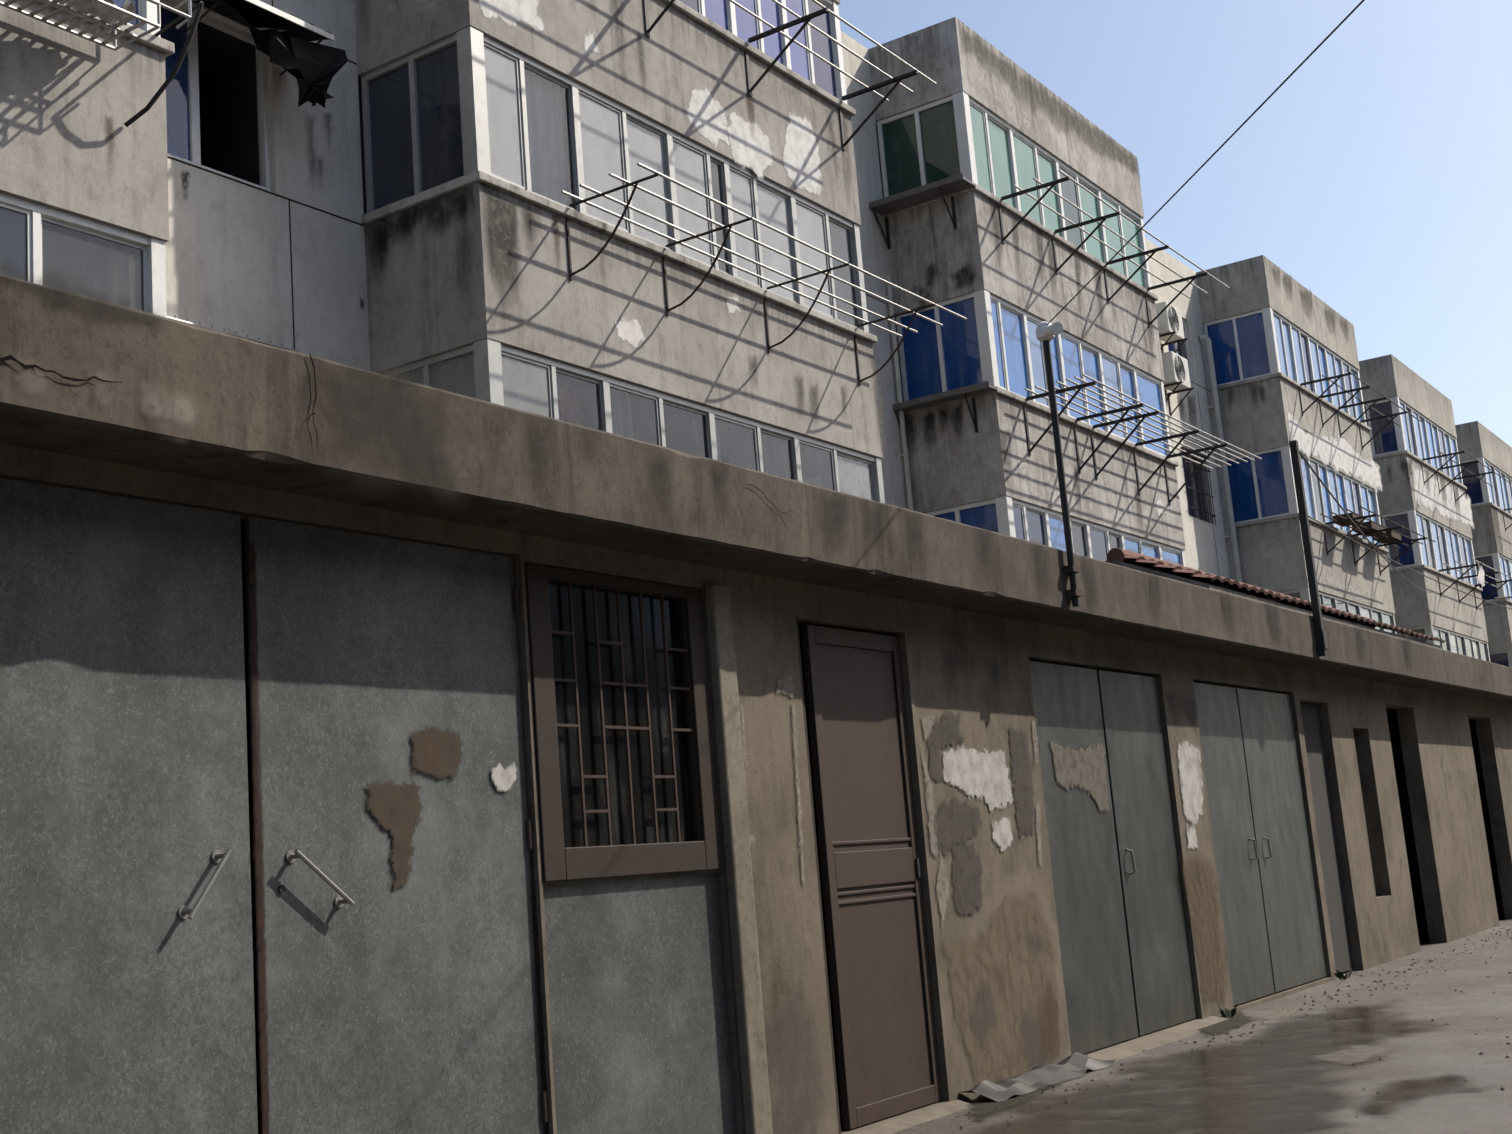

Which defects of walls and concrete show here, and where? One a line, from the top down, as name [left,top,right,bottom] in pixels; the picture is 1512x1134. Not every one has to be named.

peeling [479,0,544,32]
peeling [687,87,822,196]
crack [0,355,120,383]
peeling [614,317,645,348]
peeling [921,710,1109,925]
peeling [1177,741,1203,849]